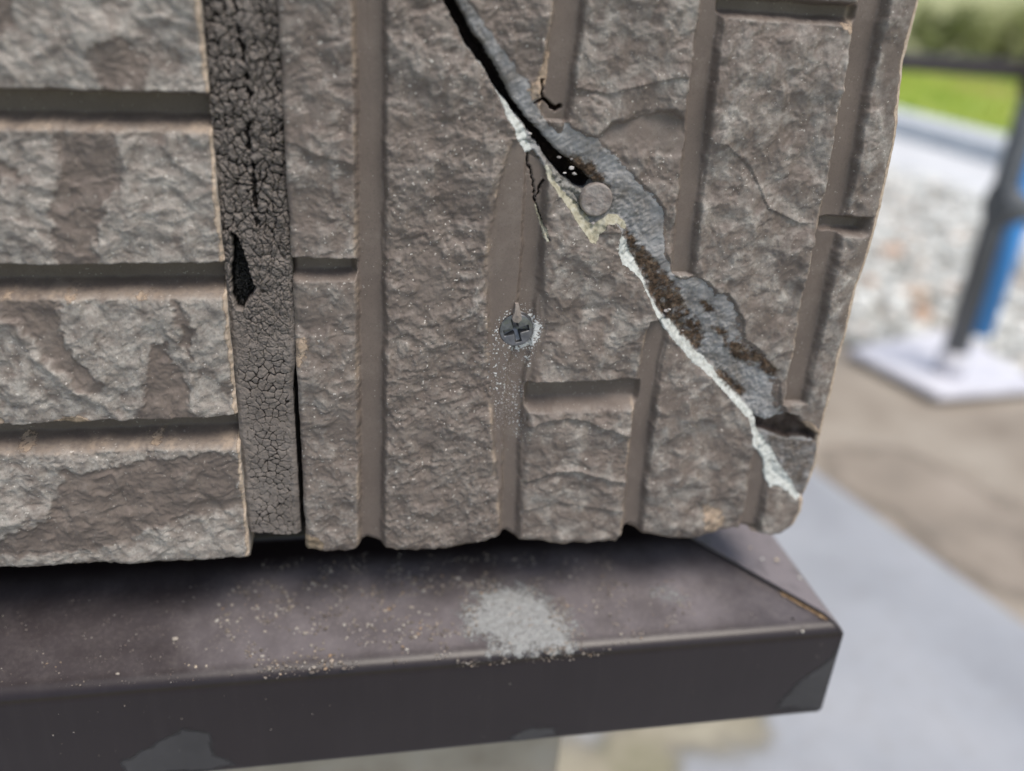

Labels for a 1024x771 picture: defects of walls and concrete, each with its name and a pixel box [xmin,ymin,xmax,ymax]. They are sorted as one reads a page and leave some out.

crack [203,0,295,533]
peeling [512,302,522,323]
peeling [527,49,550,100]
crack [443,0,812,500]